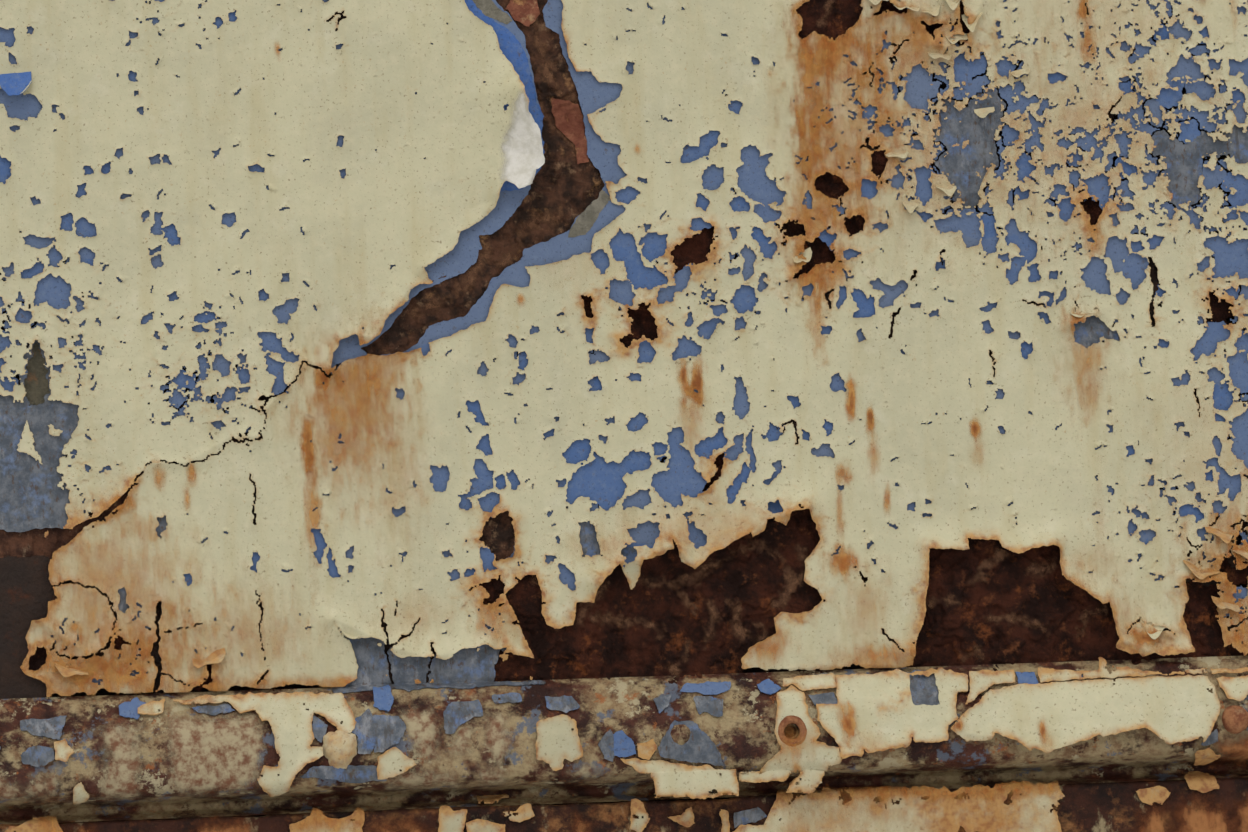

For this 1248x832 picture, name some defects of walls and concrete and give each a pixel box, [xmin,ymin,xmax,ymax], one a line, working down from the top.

peeling [0,213,97,532]
peeling [330,0,693,376]
rust [620,302,658,348]
rust [667,226,718,274]
peeling [672,130,861,361]
rust [778,0,907,327]
peeling [861,0,1166,348]
crack [150,601,203,694]
crack [381,601,436,684]
rust [470,504,825,684]
rust [867,519,1248,671]
peeling [620,657,1248,832]